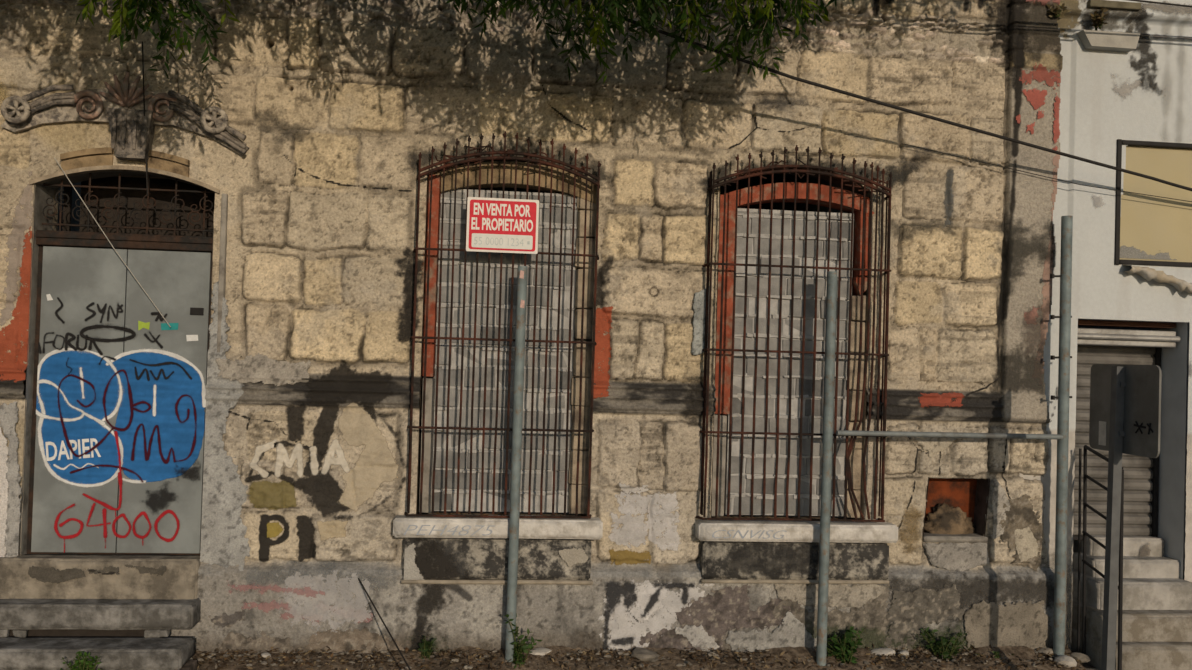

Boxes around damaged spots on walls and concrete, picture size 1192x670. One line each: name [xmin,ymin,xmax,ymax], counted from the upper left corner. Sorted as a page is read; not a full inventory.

peeling [0,171,34,382]
peeling [1016,63,1061,372]
leakage [991,0,1192,396]
peeling [0,401,21,557]
spalling [28,565,166,584]
leakage [410,538,475,651]
spalling [598,478,1051,652]